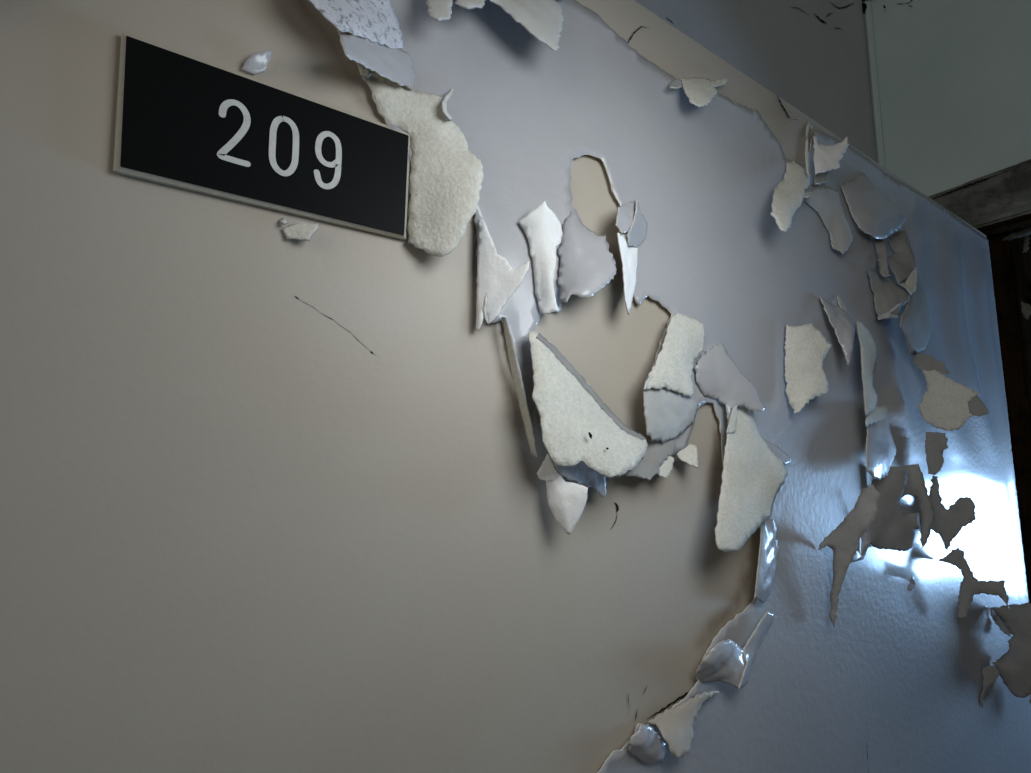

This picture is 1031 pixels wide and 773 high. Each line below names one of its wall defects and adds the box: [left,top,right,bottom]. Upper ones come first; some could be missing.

crack [793,1,855,29]
peeling [241,50,273,75]
peeling [279,217,319,241]
peeling [308,0,1031,773]